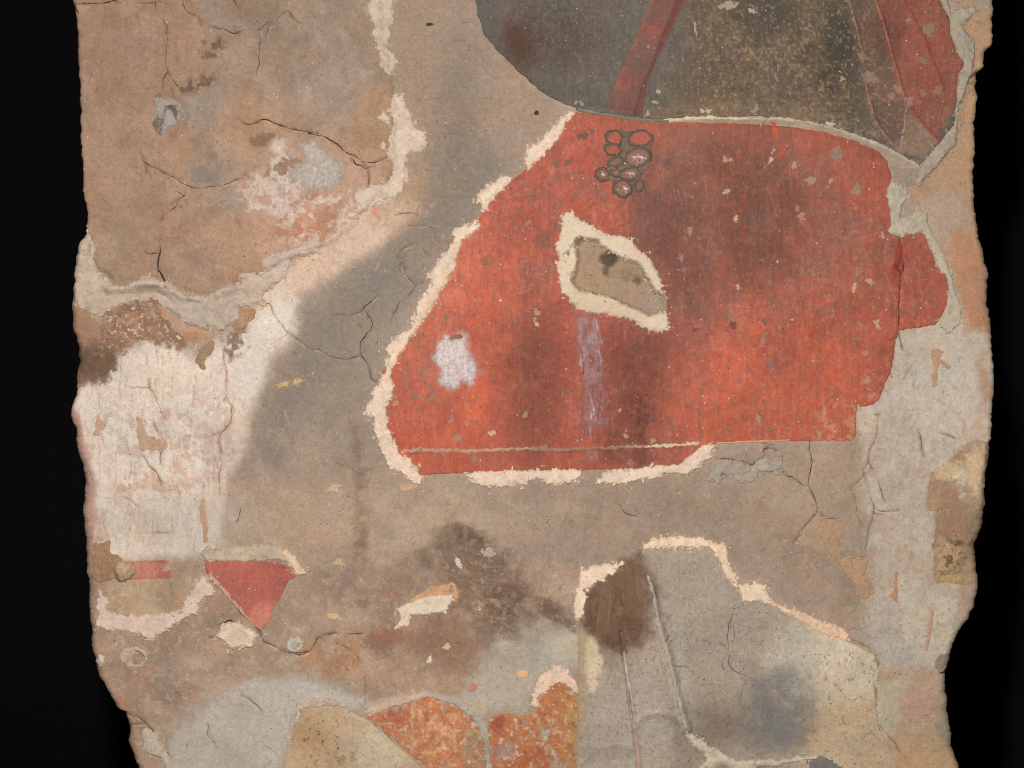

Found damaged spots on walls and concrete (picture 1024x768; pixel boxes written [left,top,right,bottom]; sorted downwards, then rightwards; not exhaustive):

crack [74,0,300,97]
crack [237,119,388,184]
crack [141,154,248,282]
spalling [552,209,674,333]
flaking render [156,304,215,370]
flaking render [232,307,256,331]
peeling [431,312,476,398]
flaking render [136,416,168,452]
flaking render [199,499,208,543]
crack [720,414,897,562]
flaking render [410,581,490,619]
crack [727,612,746,710]